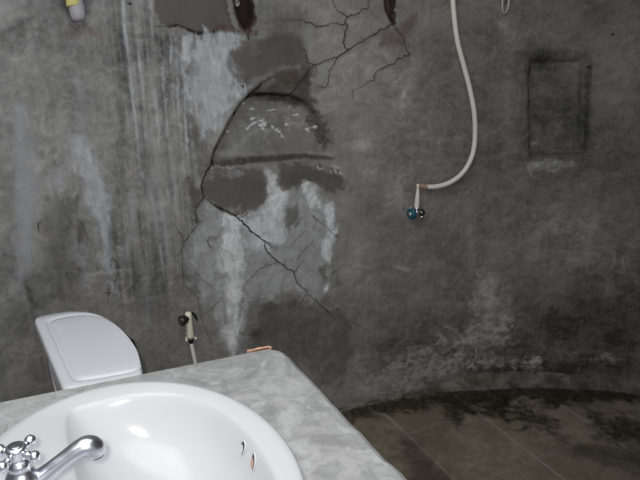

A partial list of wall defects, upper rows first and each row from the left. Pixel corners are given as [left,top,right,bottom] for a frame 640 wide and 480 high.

spalling [234,0,257,32]
leakage [172,28,343,356]
crack [176,0,411,339]
spalling [384,0,396,26]